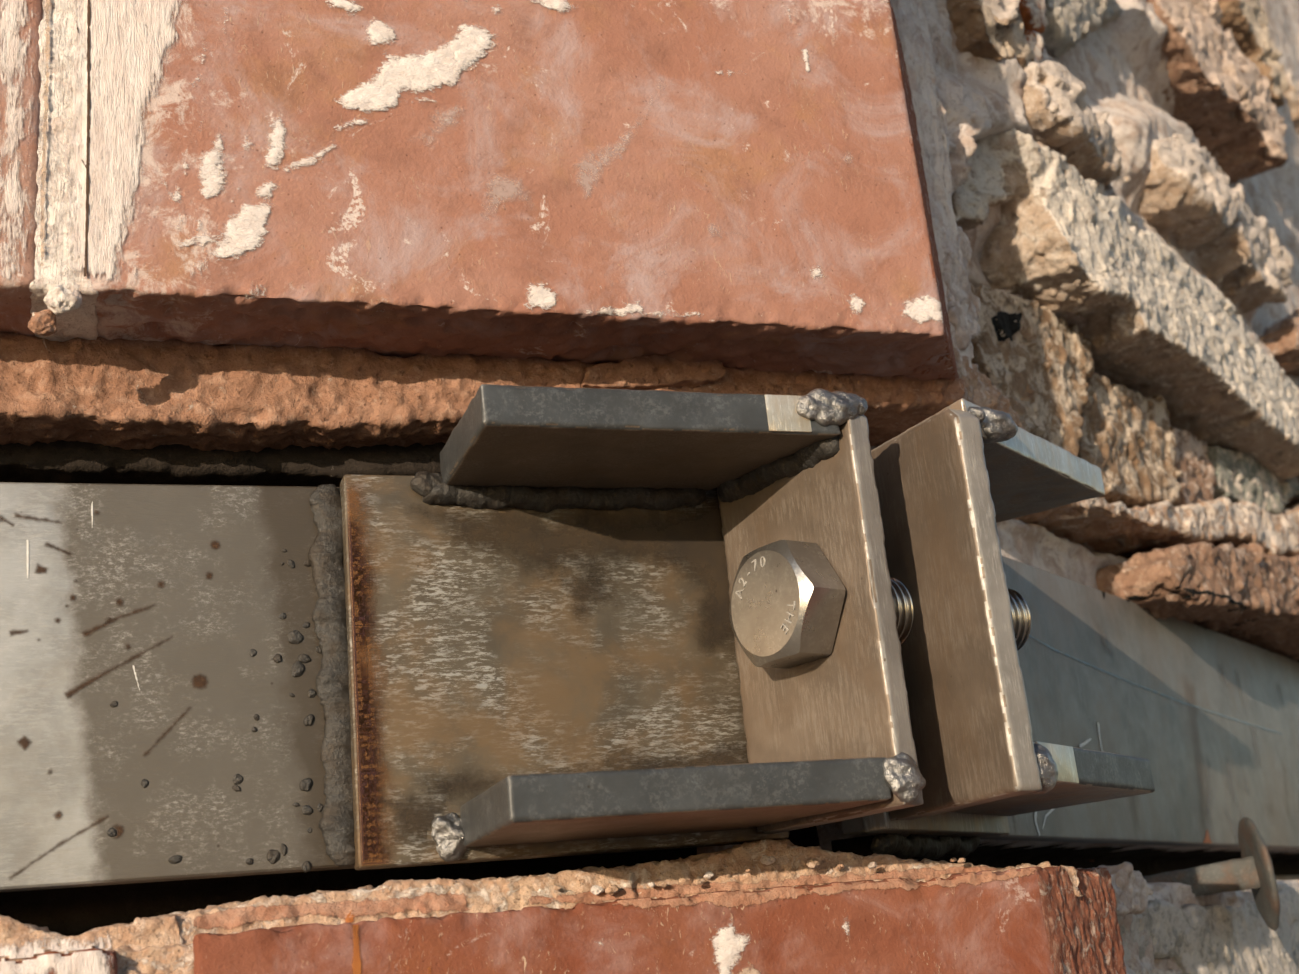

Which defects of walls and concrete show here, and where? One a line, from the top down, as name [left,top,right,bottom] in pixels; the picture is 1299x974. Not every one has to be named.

peeling [326,0,396,45]
peeling [453,26,496,73]
peeling [531,0,571,12]
peeling [183,135,239,202]
peeling [256,117,367,199]
peeling [177,217,222,275]
corrosion [345,911,361,974]